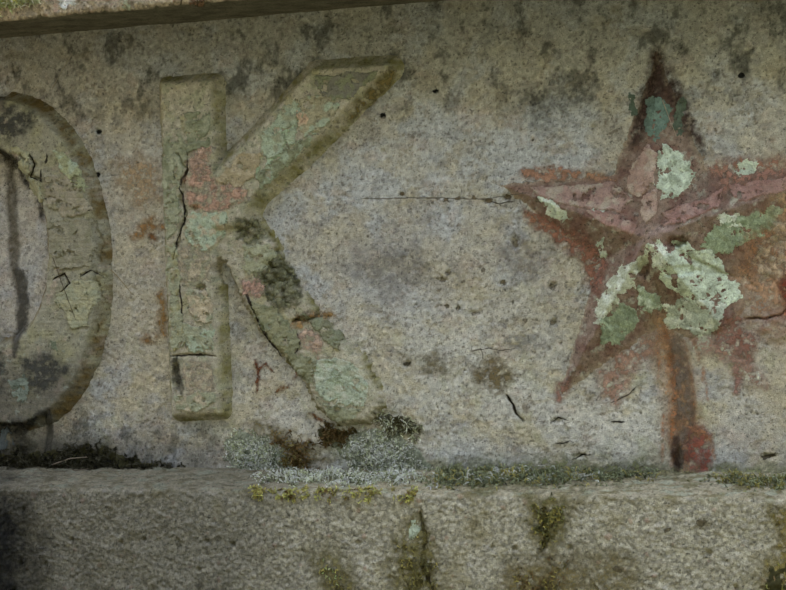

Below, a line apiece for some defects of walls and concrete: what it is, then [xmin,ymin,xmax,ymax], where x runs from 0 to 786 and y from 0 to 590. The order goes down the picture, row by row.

leakage [0,100,34,139]
crack [29,152,48,199]
peeling [530,144,786,236]
leakage [0,149,68,390]
crack [53,270,105,291]
peeling [161,70,378,423]
spalling [752,221,786,279]
rust [653,317,715,473]